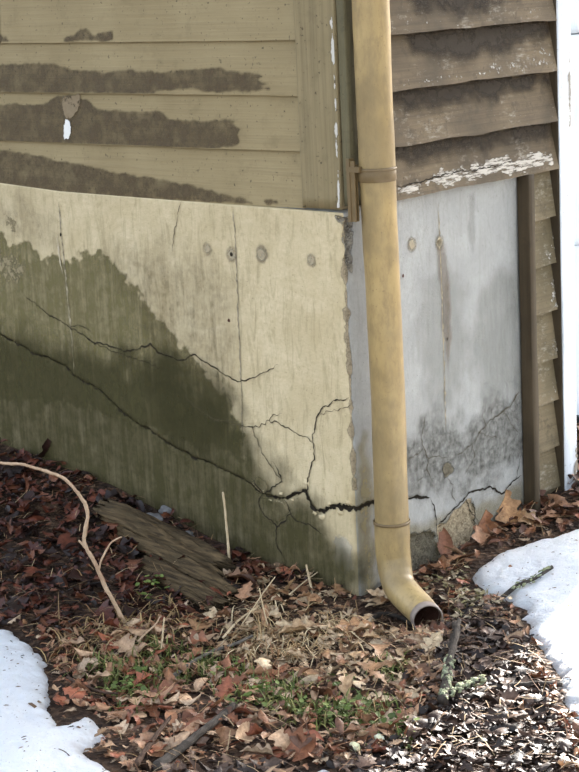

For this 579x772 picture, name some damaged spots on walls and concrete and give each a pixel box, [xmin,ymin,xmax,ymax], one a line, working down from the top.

water stain [64,29,113,42]
peeling [62,93,81,139]
water stain [0,63,270,148]
water stain [0,151,245,203]
peeling [397,151,554,194]
crack [24,295,278,382]
spalling [335,175,357,490]
crack [2,335,374,559]
crack [407,392,522,526]
water stain [407,401,523,489]
spalling [410,498,476,571]